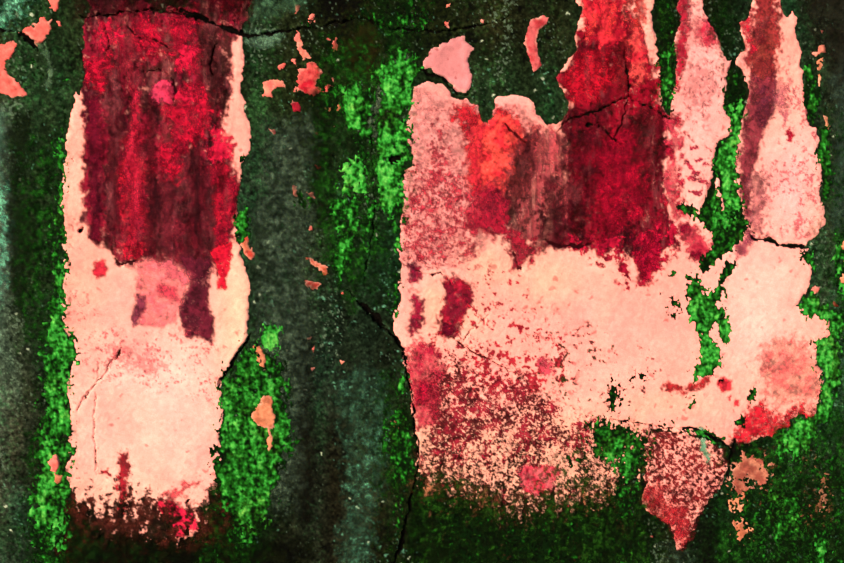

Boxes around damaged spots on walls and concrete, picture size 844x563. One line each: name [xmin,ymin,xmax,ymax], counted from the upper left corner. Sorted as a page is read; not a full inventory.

peeling [0,0,61,98]
peeling [214,27,251,184]
crack [80,8,508,74]
crack [420,69,469,96]
crack [560,58,670,142]
peeling [48,91,266,545]
leakage [402,0,820,563]
peeling [393,0,830,550]
peeling [251,395,276,451]
crack [350,254,420,563]
crack [613,419,736,479]
leakage [56,452,312,563]